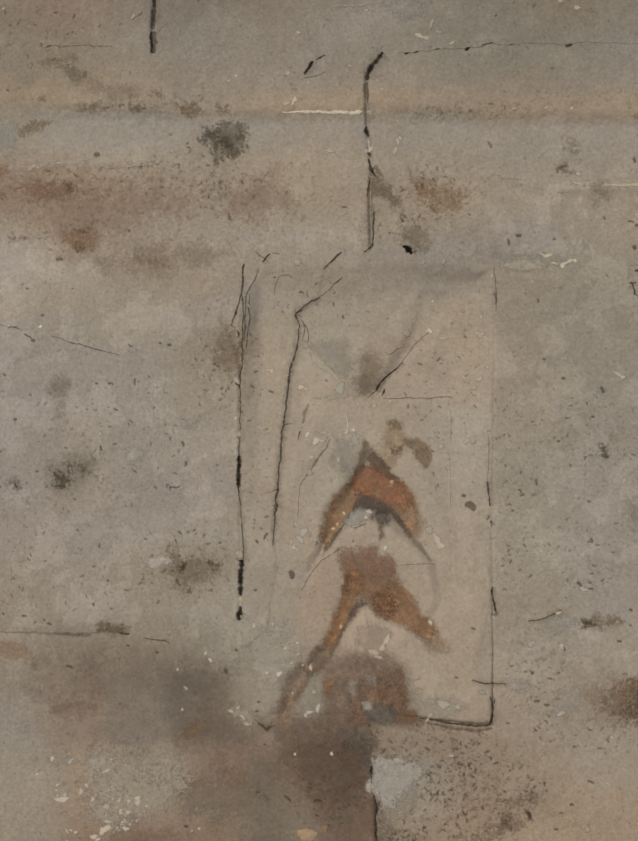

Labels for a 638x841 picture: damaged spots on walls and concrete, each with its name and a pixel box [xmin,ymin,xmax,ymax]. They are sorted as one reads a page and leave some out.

crack [139,0,157,53]
crack [365,52,383,103]
crack [364,126,379,252]
crack [231,251,292,620]
crack [272,252,343,545]
rust [382,420,431,468]
crack [370,333,449,399]
rust [320,466,417,547]
leakage [242,621,345,718]
rust [308,546,445,726]
crack [369,766,377,841]